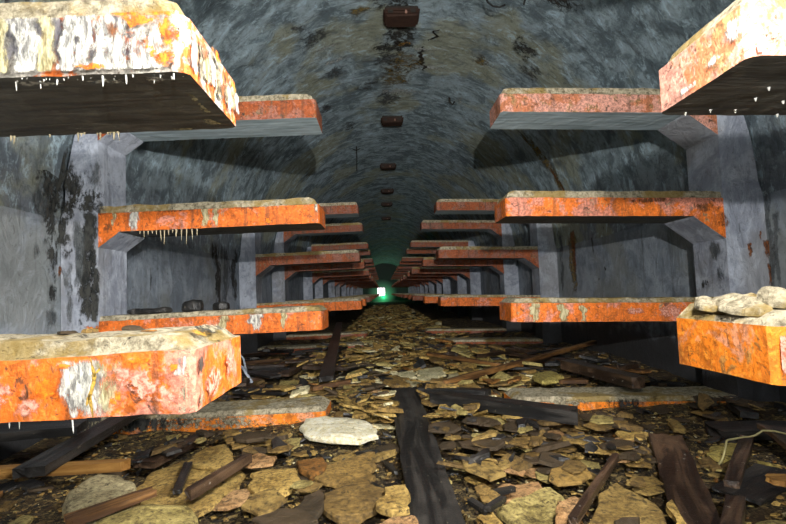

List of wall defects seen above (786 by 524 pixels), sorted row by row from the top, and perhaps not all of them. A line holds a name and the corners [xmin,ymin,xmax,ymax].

corrosion [107,11,180,66]
damp [34,148,104,325]
damp [129,212,139,229]
damp [201,208,220,226]